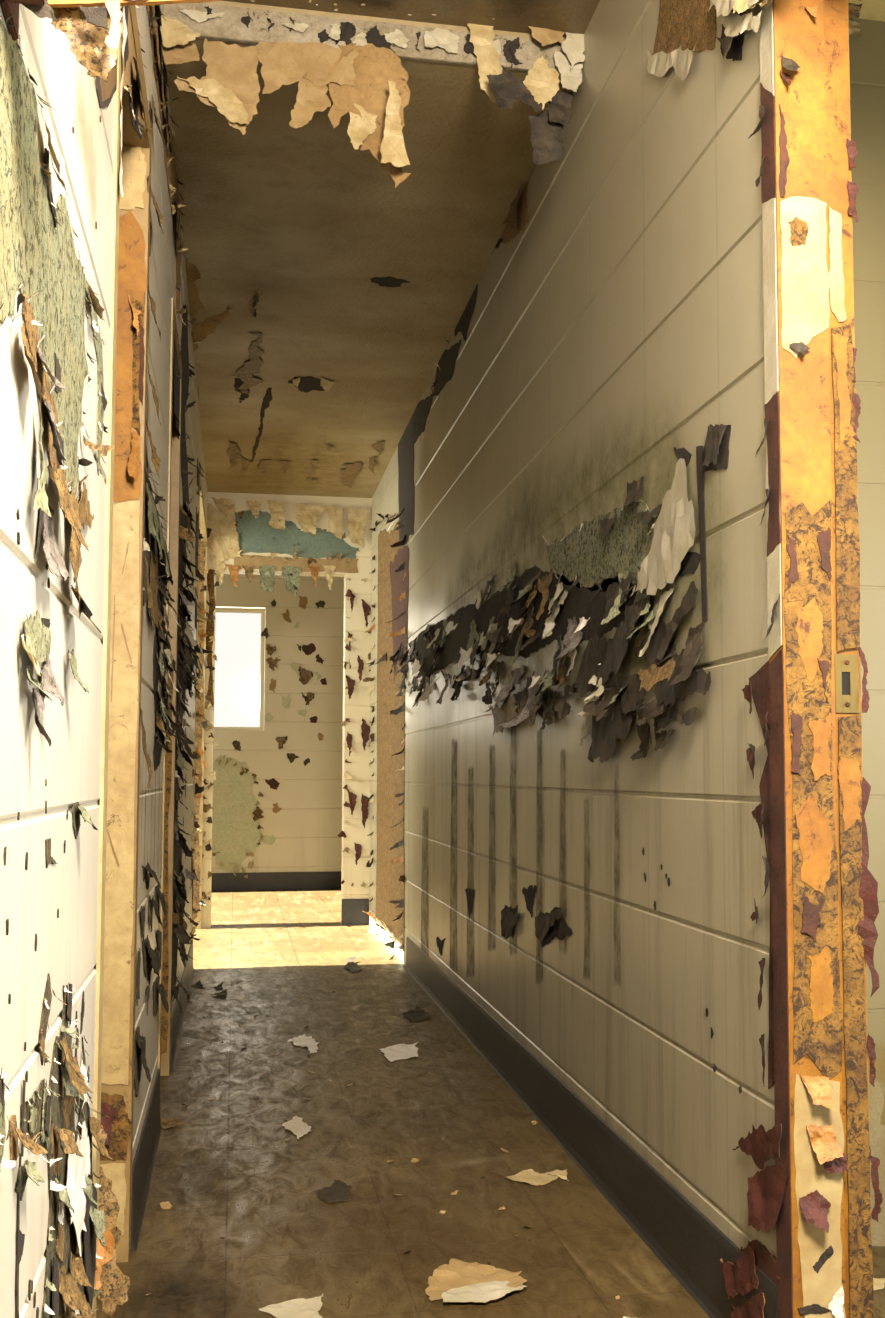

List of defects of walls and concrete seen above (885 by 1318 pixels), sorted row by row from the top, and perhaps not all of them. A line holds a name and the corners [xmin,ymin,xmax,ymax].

peeling [852,347,861,442]
peeling [0,0,731,1097]
peeling [647,0,859,1318]
peeling [858,647,870,713]
peeling [858,777,879,996]
peeling [0,973,130,1318]
peeling [317,1179,352,1203]
peeling [543,1169,569,1182]
peeling [866,1034,885,1246]